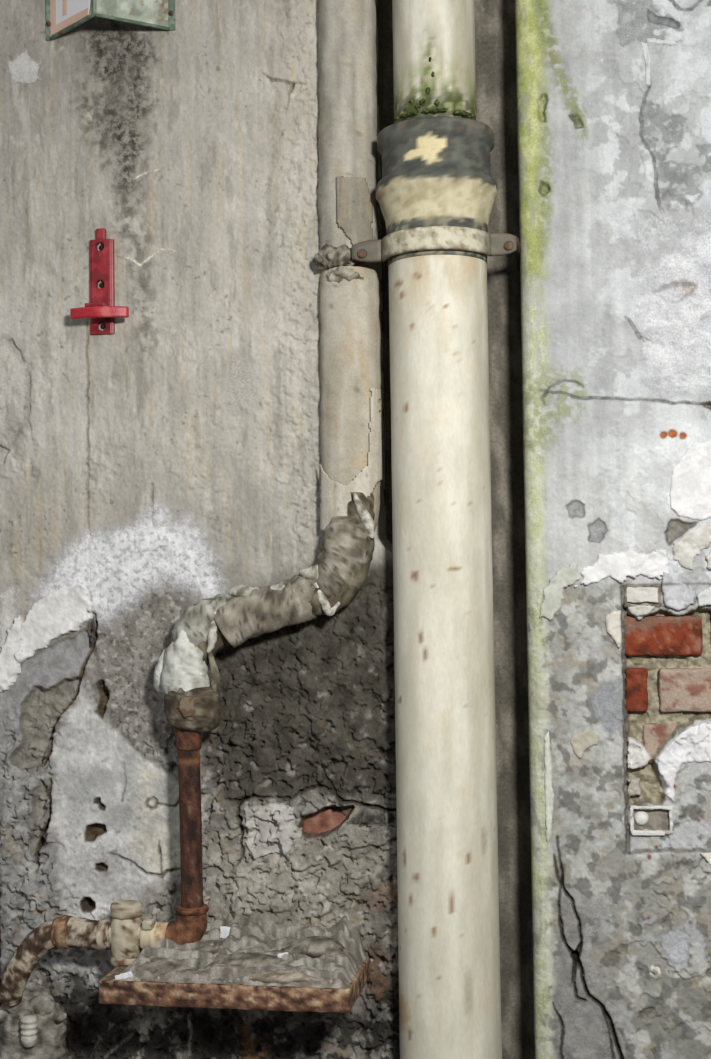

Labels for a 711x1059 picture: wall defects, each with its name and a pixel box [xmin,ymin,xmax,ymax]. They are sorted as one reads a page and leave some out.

crack [669,0,702,11]
mould [83,21,154,189]
crack [640,62,663,211]
crack [540,380,705,405]
efflorescence [31,503,224,623]
water stain [515,0,586,1059]
spalling [539,441,711,808]
spalling [0,575,201,871]
peeling [244,803,397,867]
peeling [544,731,555,849]
peeling [220,926,230,939]
crack [553,836,624,1059]